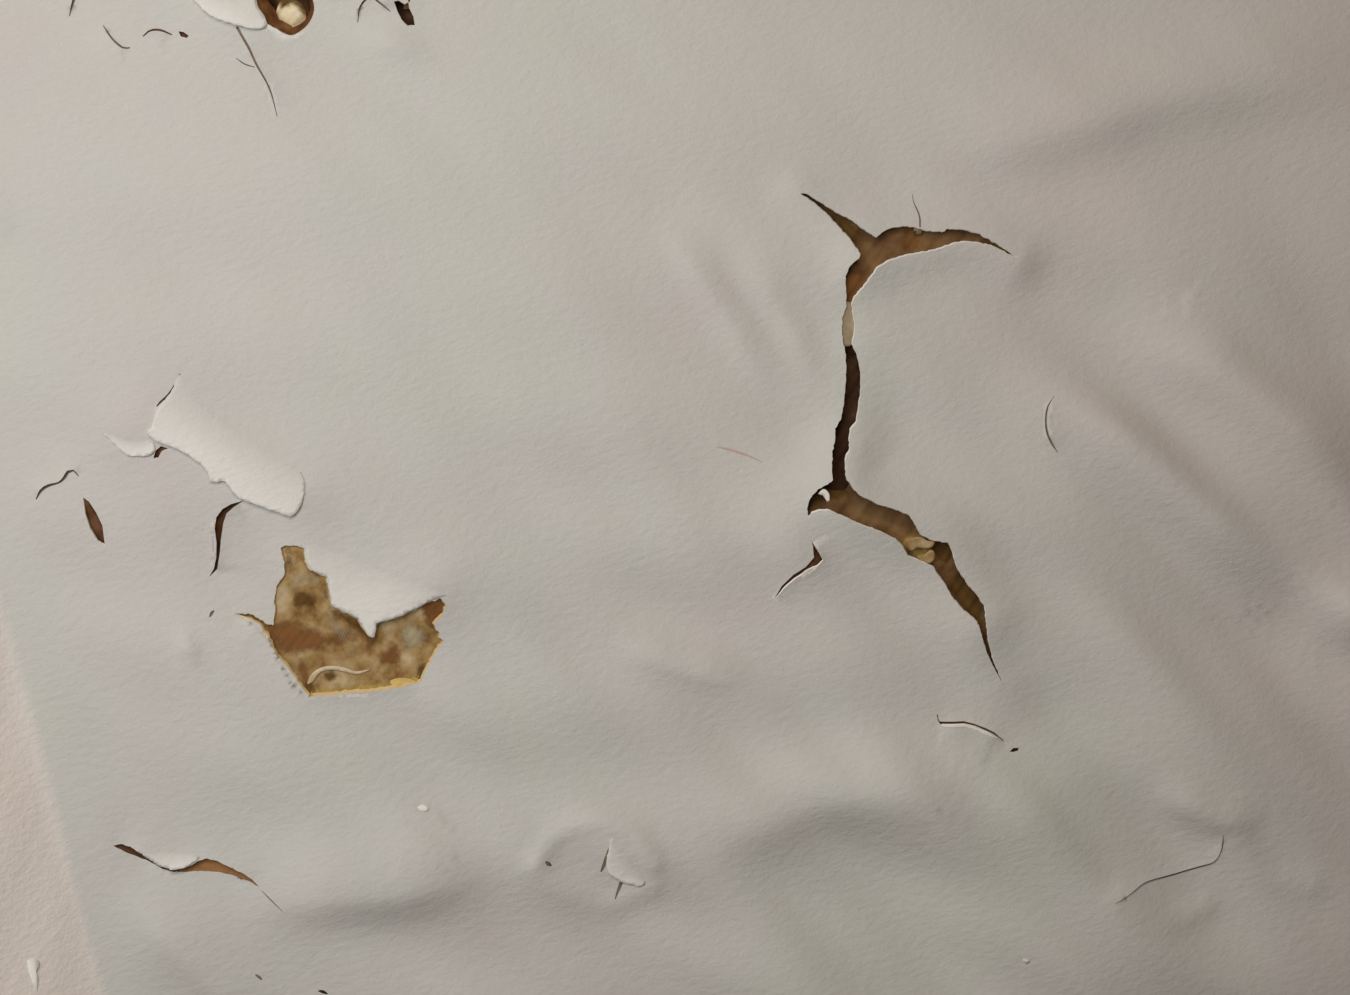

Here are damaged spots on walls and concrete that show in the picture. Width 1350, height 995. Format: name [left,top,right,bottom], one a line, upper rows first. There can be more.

peeling [194,0,310,115]
peeling [36,470,79,499]
peeling [83,498,105,545]
peeling [102,374,305,577]
crack [775,193,1016,683]
spalling [236,544,446,697]
crack [937,715,1018,752]
crack [1119,835,1224,902]